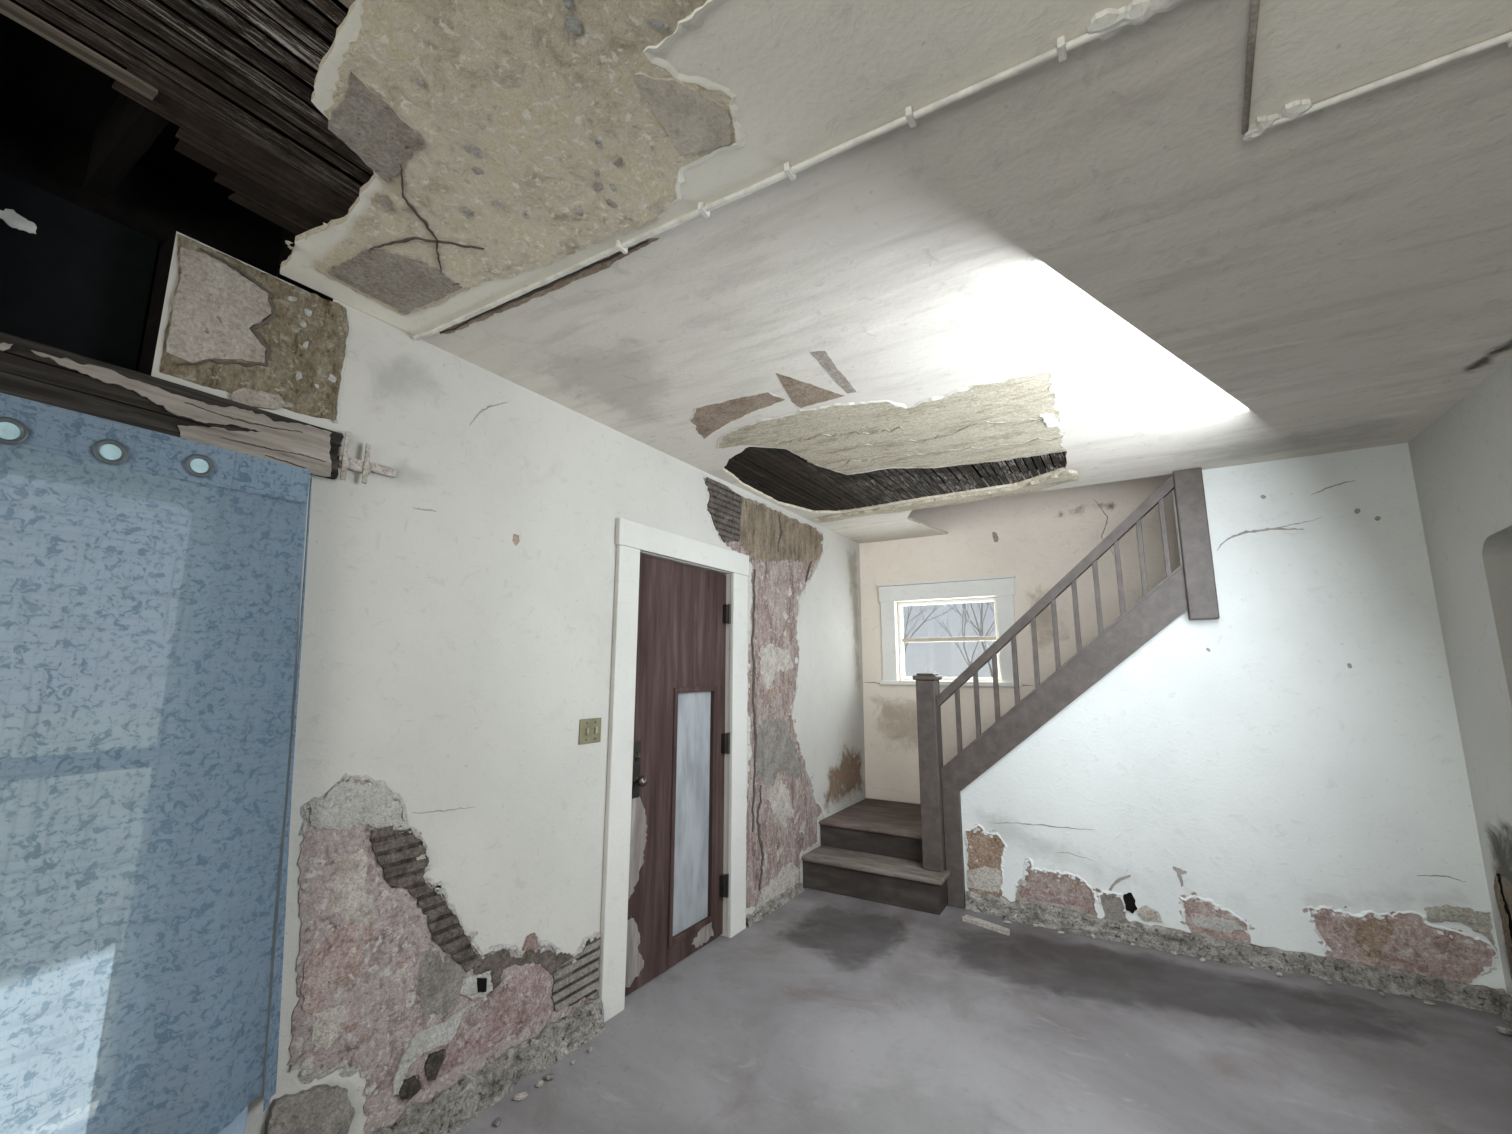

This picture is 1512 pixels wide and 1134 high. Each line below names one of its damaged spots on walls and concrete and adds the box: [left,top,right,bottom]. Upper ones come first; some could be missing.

flaking render [31,0,747,477]
flaking render [716,369,1067,474]
flaking render [703,477,824,909]
flaking render [287,773,601,1134]
flaking render [963,824,1255,944]